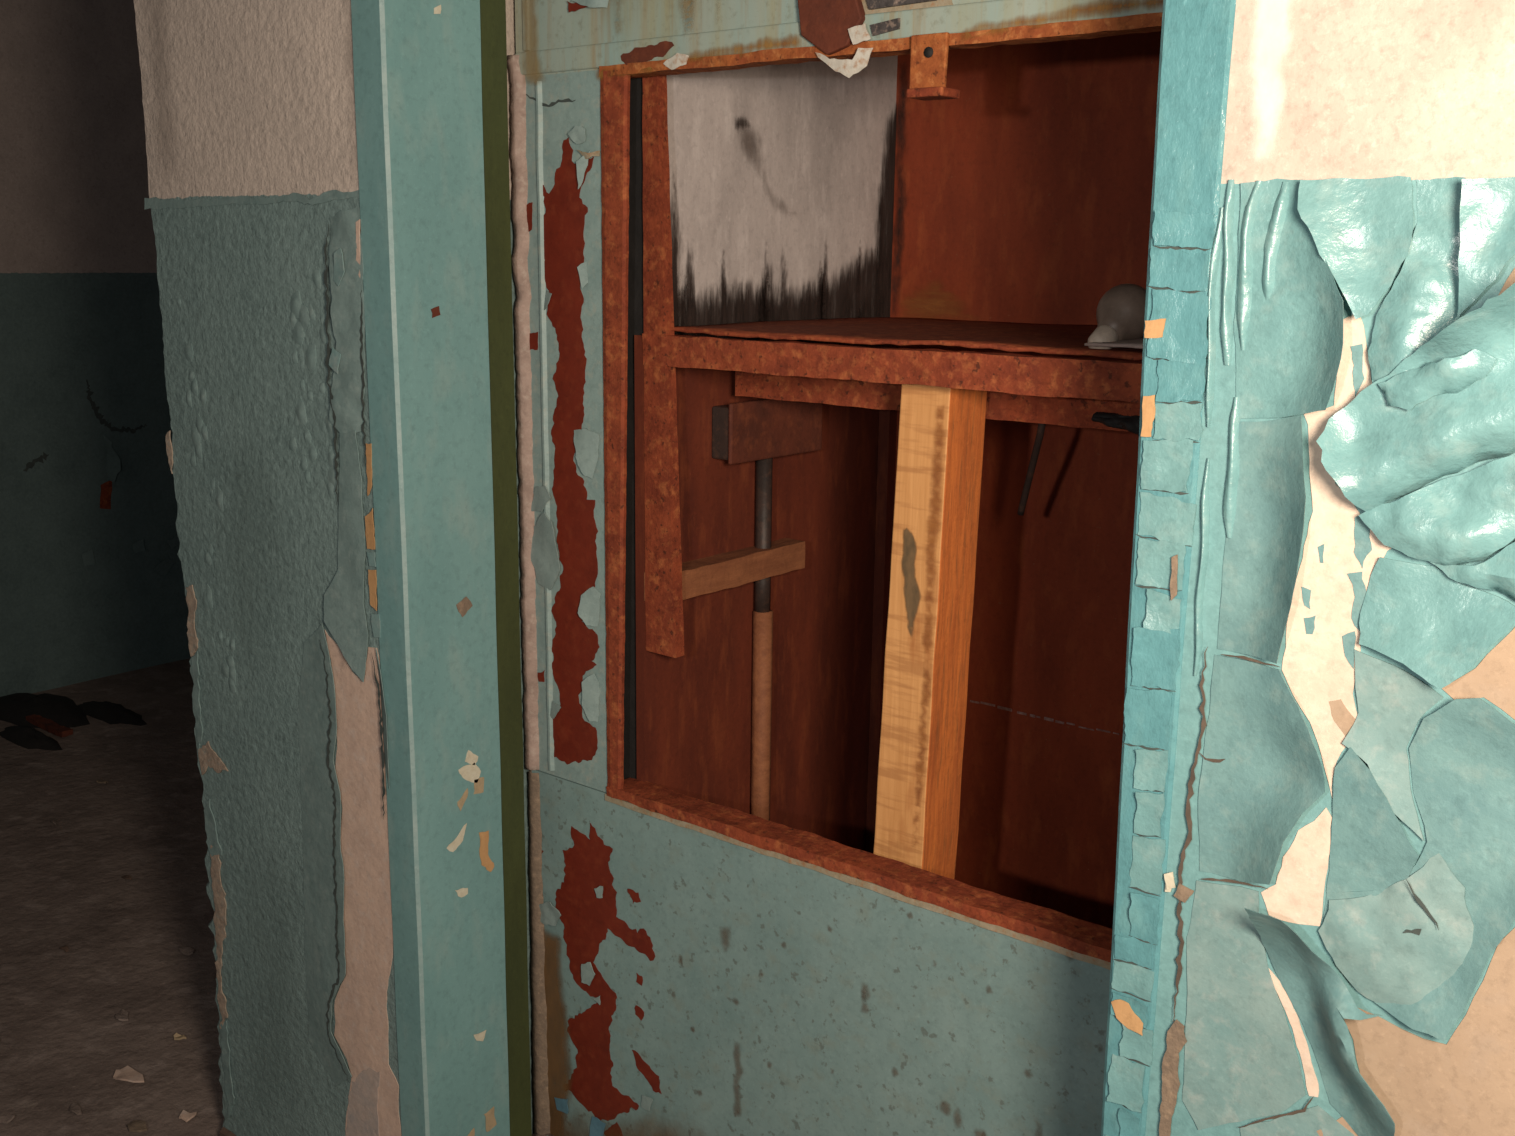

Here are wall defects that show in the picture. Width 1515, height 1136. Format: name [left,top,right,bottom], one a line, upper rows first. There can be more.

corrosion [965,0,1163,35]
peeling [144,190,402,1136]
corrosion [544,934,576,1136]
peeling [1159,176,1515,1136]